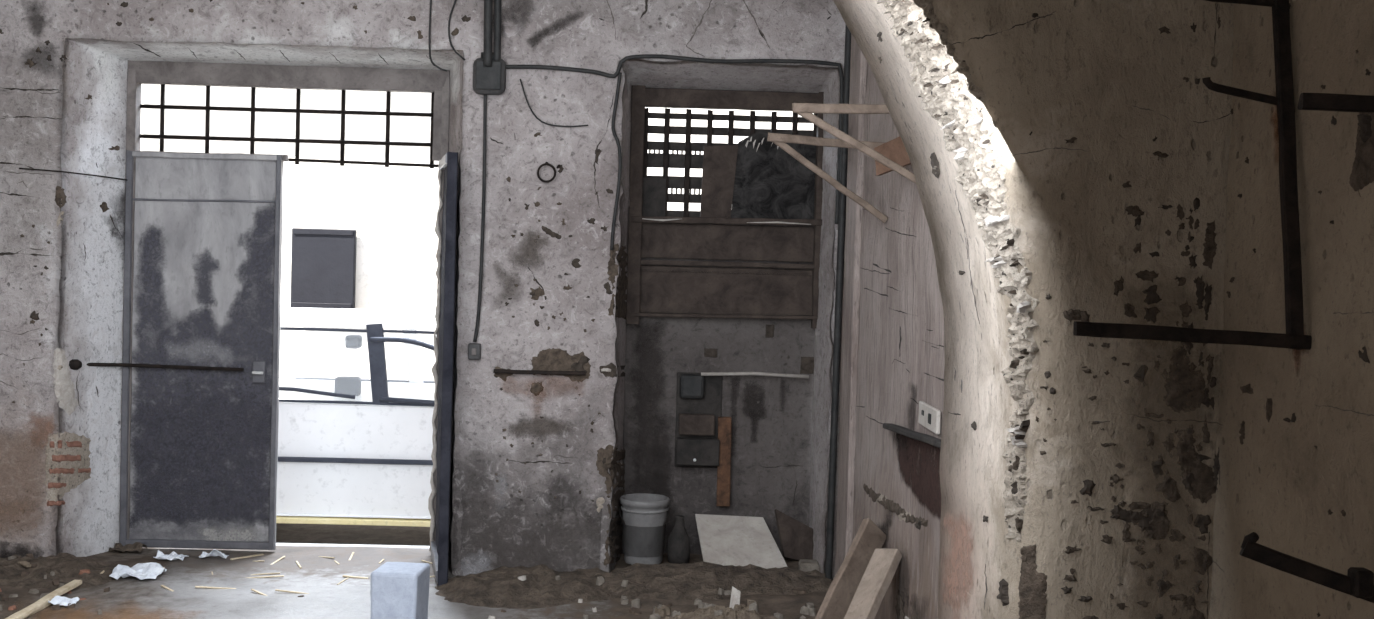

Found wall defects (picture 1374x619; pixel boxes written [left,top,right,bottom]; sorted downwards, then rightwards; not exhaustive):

spalling [505,267,567,330]
spalling [511,202,572,239]
spalling [563,218,628,332]
spalling [877,0,1099,619]
flaking render [30,310,91,507]
spalling [494,366,513,391]
spalling [530,348,625,433]
peeling [1071,197,1235,619]
spalling [579,445,625,566]
spalling [863,483,928,530]